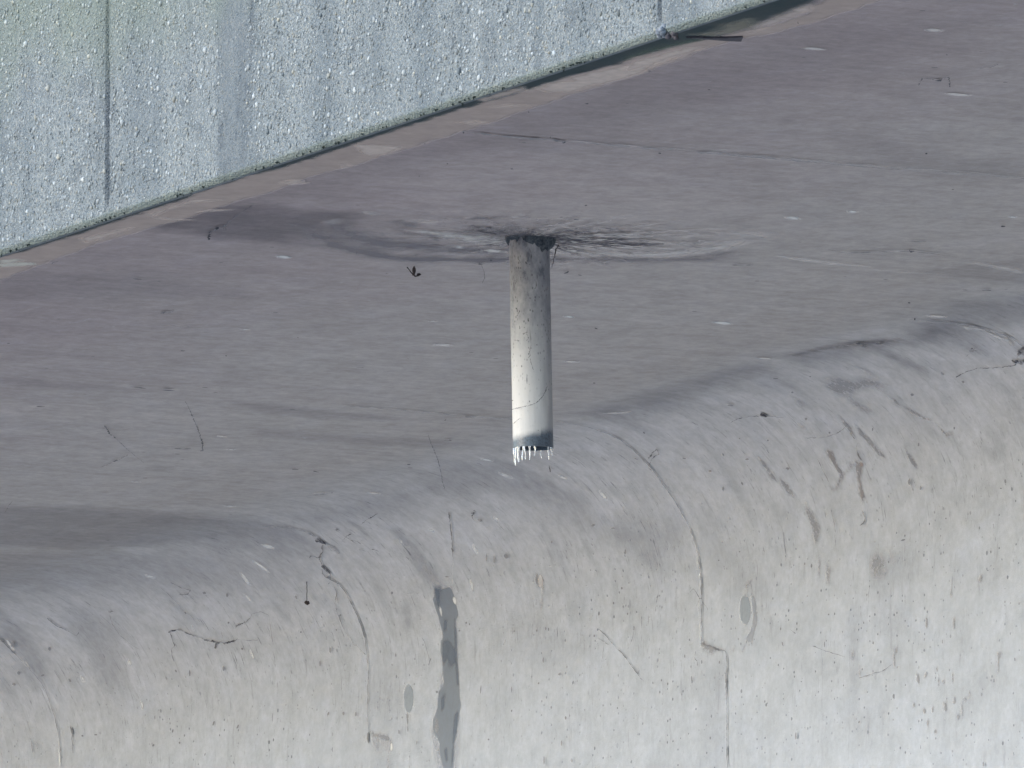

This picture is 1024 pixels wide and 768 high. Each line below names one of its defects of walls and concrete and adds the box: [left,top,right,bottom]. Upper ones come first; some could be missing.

damp [310,223,735,263]
crack [956,346,1024,377]
damp [433,587,461,768]